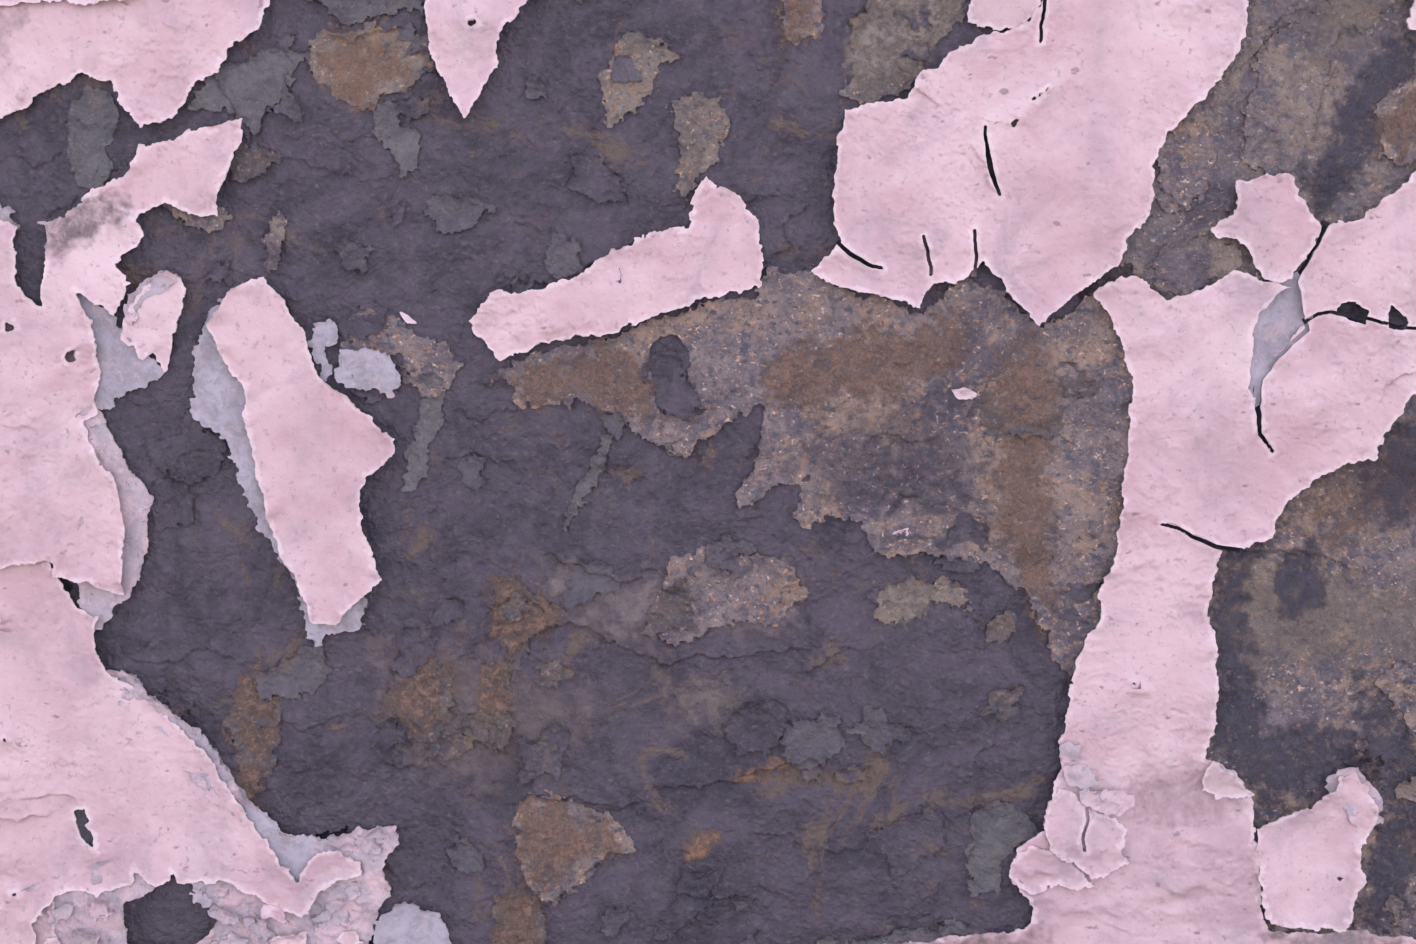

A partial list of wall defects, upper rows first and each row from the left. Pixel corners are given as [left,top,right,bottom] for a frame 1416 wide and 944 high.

crack [1039,0,1047,42]
peeling [0,72,162,306]
peeling [1119,0,1416,407]
crack [1294,220,1330,275]
crack [1302,311,1416,330]
crack [1253,386,1273,452]
peeling [33,0,1135,944]
crack [1161,523,1241,552]
peeling [1205,394,1416,939]